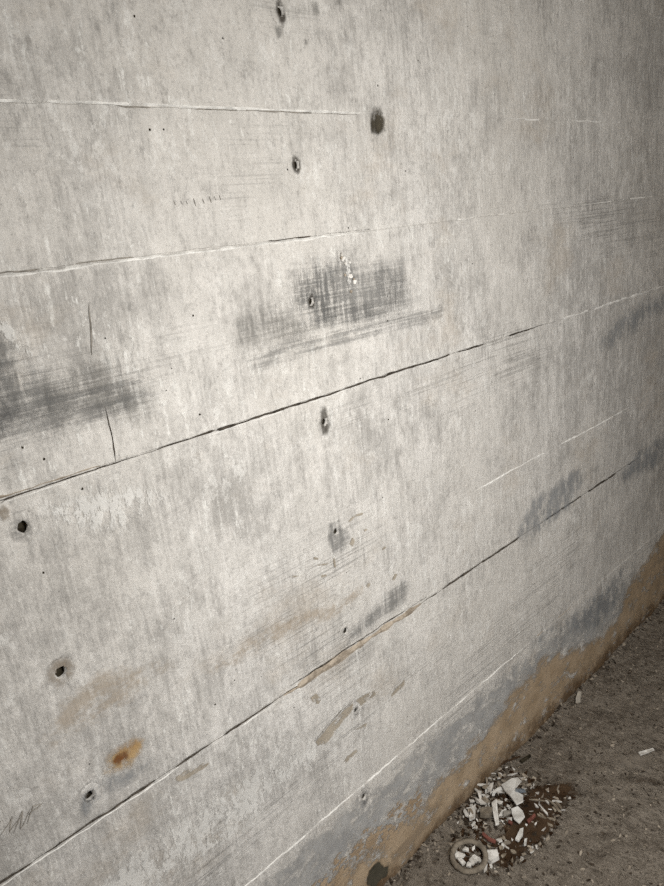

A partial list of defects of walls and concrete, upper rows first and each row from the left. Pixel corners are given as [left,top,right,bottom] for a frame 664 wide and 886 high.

rust [110,740,142,768]
damp [276,534,664,886]